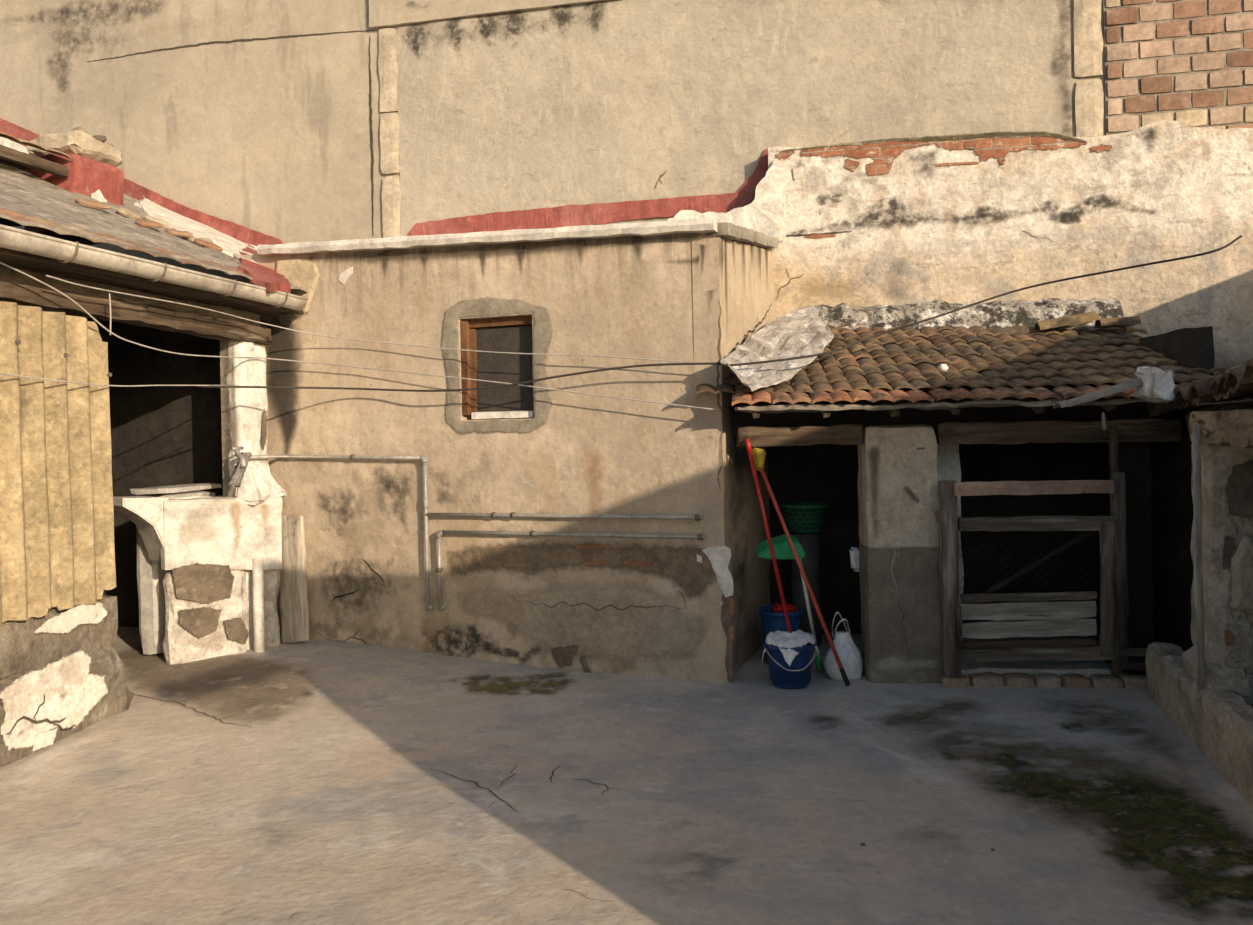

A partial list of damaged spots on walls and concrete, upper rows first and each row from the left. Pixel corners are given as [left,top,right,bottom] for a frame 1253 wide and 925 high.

water stain [478,11,524,44]
water stain [552,5,570,25]
spalling [775,136,1112,242]
water stain [843,199,937,226]
water stain [956,207,1011,223]
water stain [1036,196,1120,237]
peeling [34,603,107,634]
spalling [448,542,734,682]
crack [513,590,686,611]
peeling [0,651,109,751]
crack [431,767,519,813]
crack [550,765,609,795]